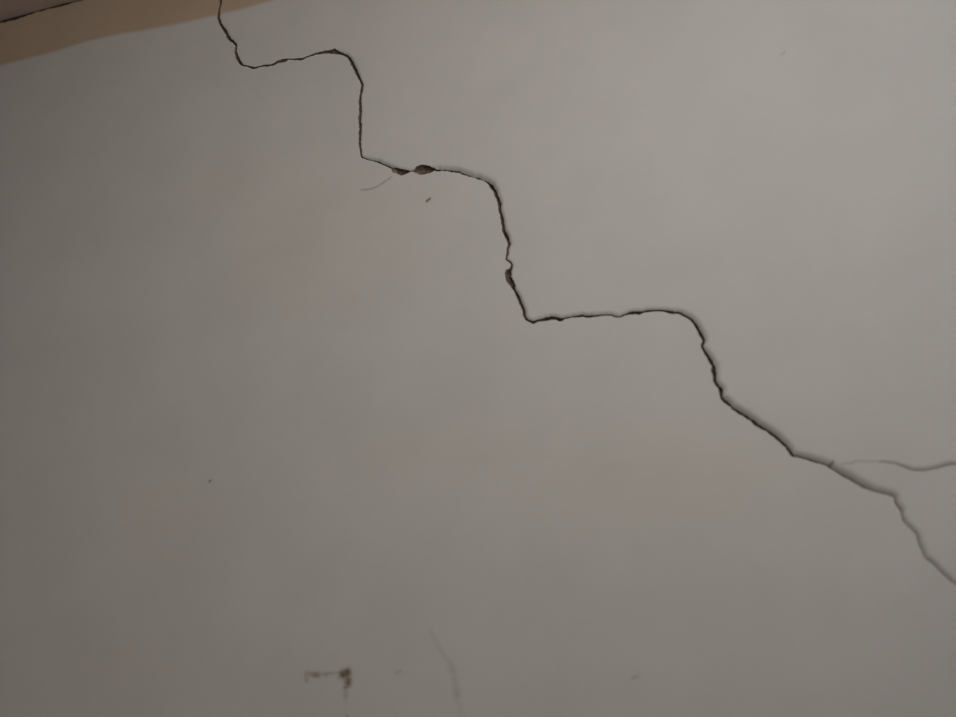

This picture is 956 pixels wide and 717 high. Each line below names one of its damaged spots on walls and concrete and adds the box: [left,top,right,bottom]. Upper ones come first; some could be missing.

crack [0,0,82,23]
crack [217,0,927,560]